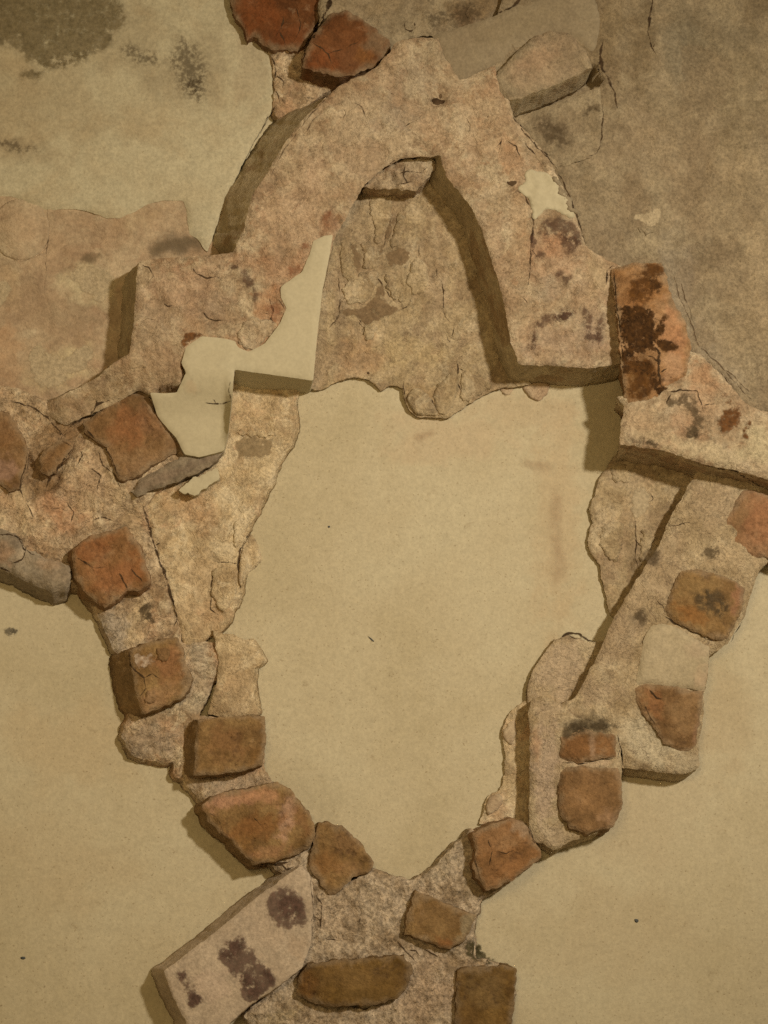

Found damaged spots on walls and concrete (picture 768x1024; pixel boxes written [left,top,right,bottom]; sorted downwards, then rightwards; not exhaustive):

damp [0,0,126,78]
spalling [496,31,592,118]
spalling [518,169,579,219]
spalling [340,196,429,341]
rust [620,264,679,400]
flaking render [407,370,550,416]
spalling [236,429,275,458]
spalling [610,463,655,561]
crack [78,500,178,625]
spalling [134,648,170,668]
damp [267,887,306,929]
damp [219,938,275,1002]